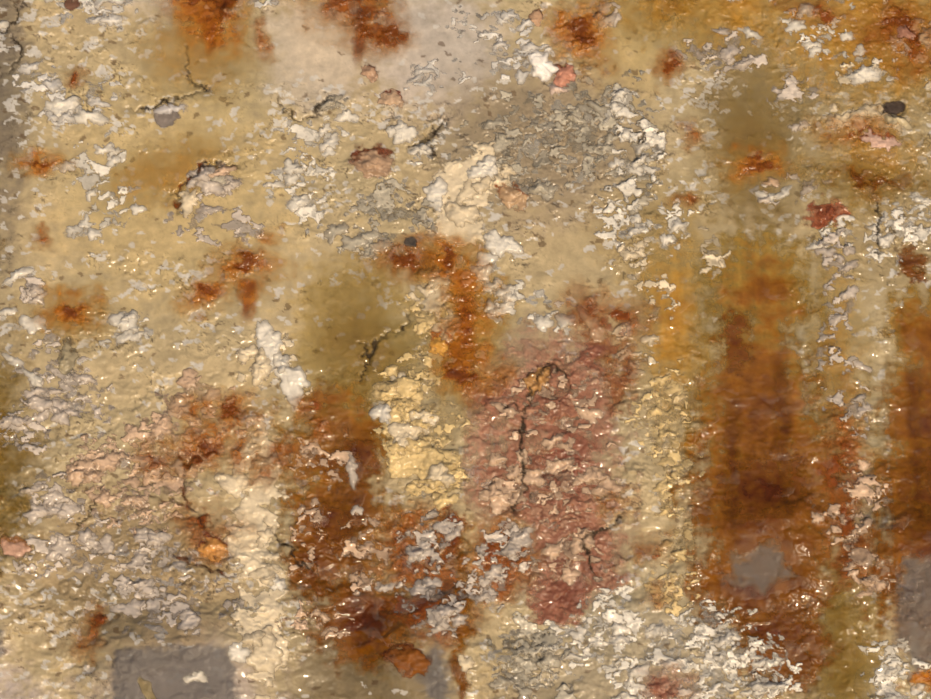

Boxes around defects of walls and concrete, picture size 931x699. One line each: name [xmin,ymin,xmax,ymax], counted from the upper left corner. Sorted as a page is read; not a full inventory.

crack [0,5,23,70]
rust [171,0,242,48]
rust [320,0,409,55]
rust [550,4,606,57]
peeling [595,0,622,29]
rust [863,1,931,75]
peeling [0,267,115,455]
peeling [99,310,150,348]
peeling [263,6,803,699]
rust [174,235,640,699]
rust [668,231,931,692]
peeling [12,320,358,699]